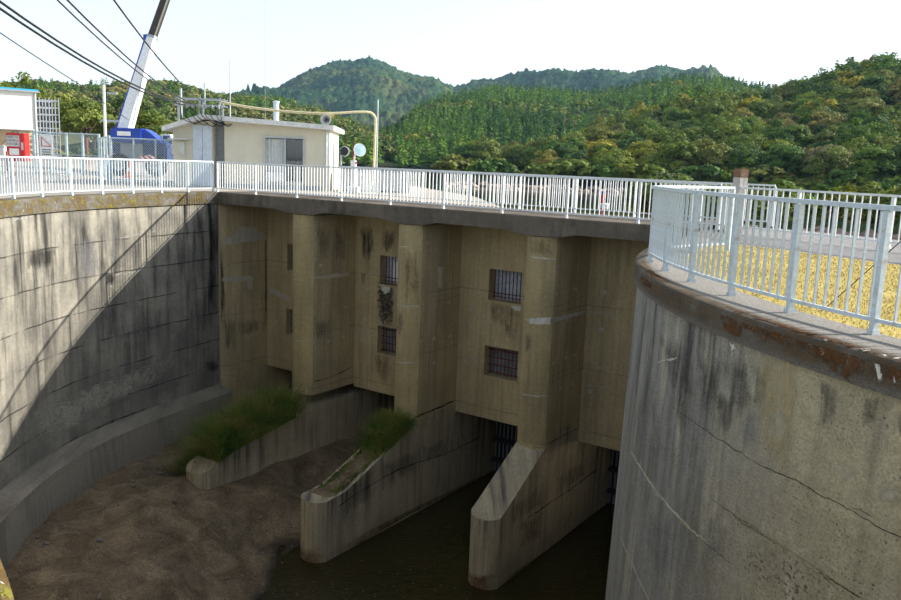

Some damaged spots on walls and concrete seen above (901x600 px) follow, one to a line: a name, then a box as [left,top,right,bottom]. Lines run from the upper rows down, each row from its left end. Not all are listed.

leakage [208,228,224,311]
corrosion [720,306,901,382]
crack [676,409,901,538]